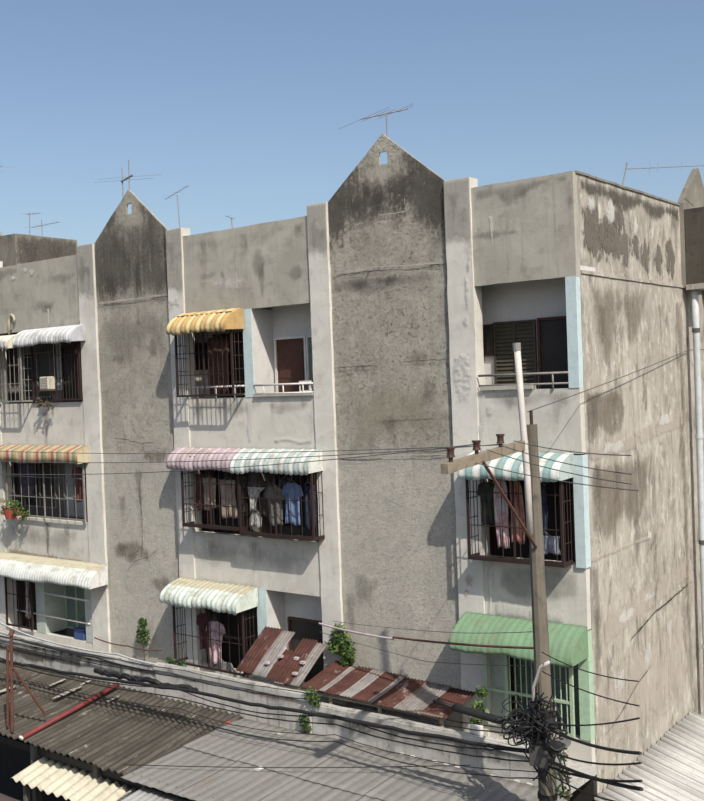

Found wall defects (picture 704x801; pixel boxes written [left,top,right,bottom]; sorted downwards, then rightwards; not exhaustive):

water stain [306,152,471,250]
water stain [582,182,679,221]
water stain [17,208,183,297]